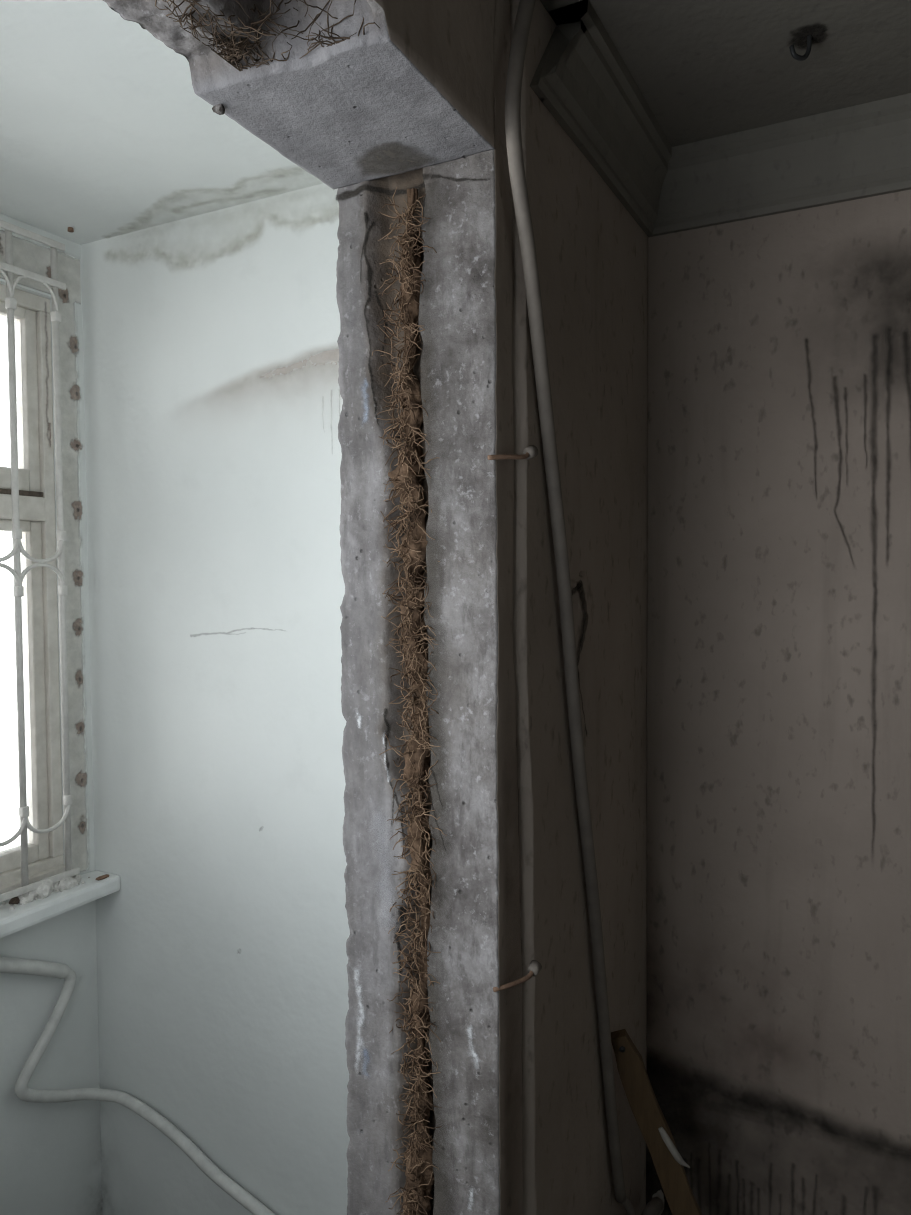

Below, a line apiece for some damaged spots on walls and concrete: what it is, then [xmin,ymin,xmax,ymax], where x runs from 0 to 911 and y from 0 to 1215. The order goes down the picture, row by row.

crack [384,709,405,844]
crack [394,907,407,991]